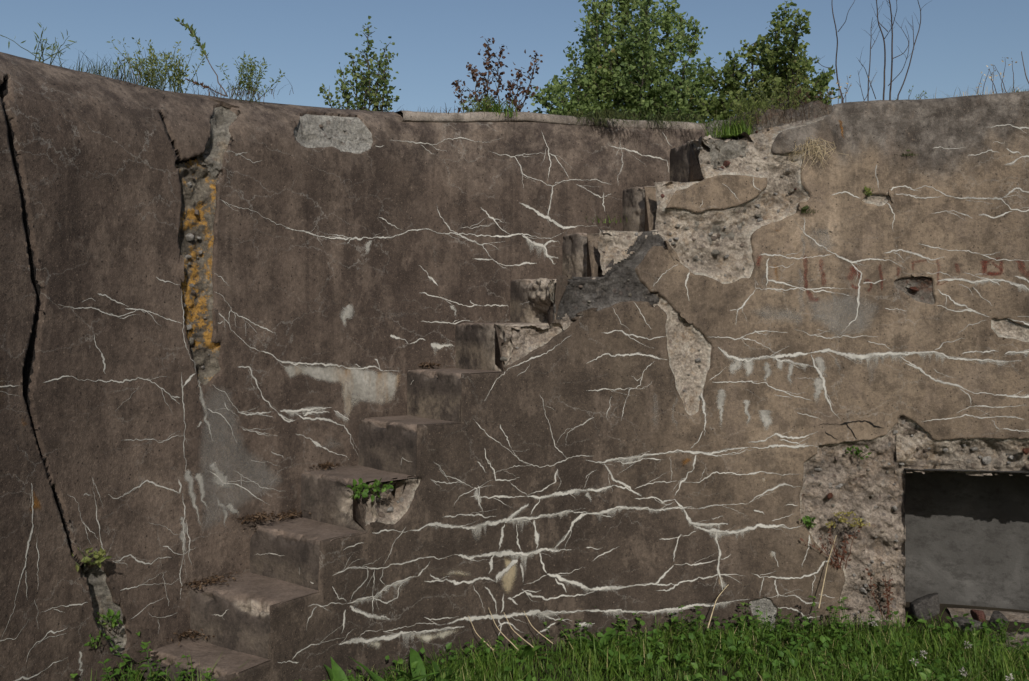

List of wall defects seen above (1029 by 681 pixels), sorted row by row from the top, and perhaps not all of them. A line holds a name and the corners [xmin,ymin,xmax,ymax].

spalling [294,113,373,154]
crack [0,77,414,681]
crack [222,124,1029,663]
spalling [500,115,827,416]
spalling [894,271,935,305]
spalling [991,318,1029,342]
spalling [800,417,1029,627]